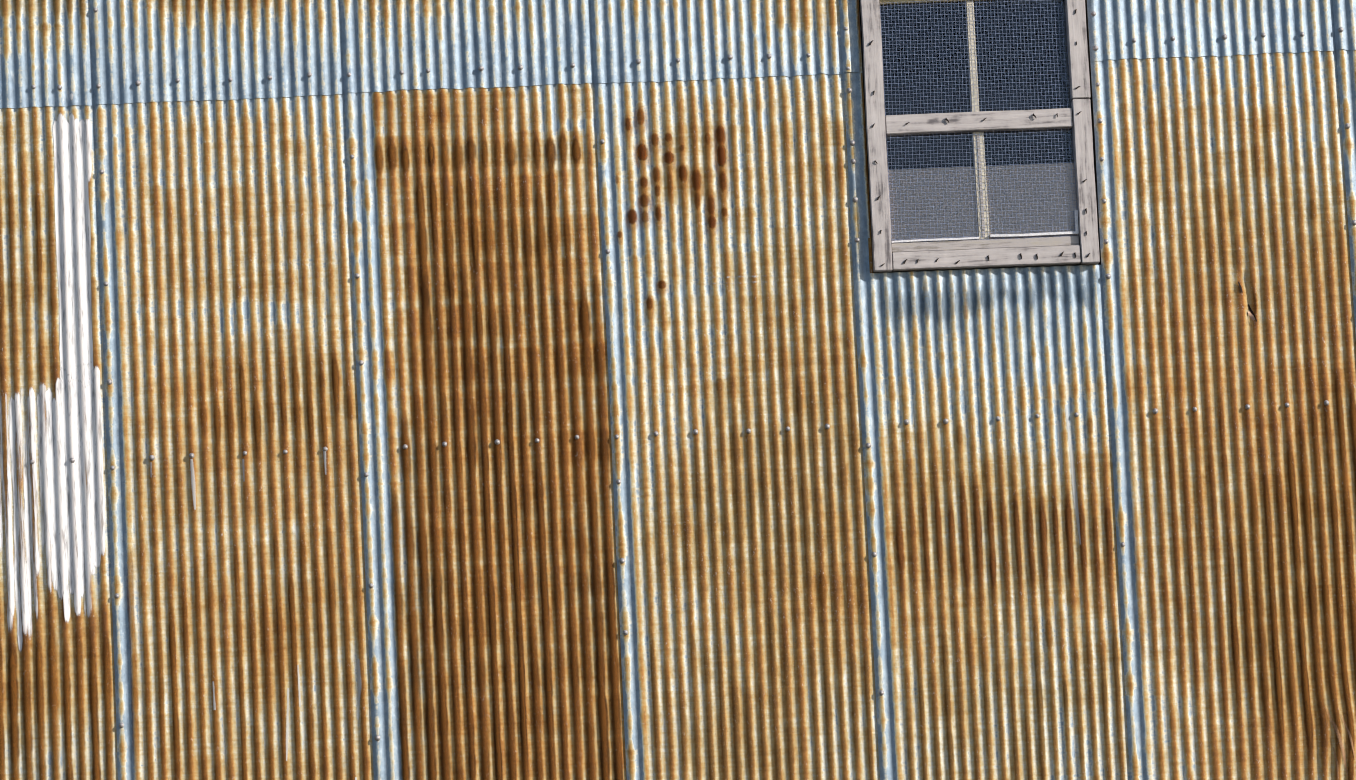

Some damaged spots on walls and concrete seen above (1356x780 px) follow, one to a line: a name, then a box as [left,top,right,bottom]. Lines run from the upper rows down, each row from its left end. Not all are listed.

corrosion [376,144,409,171]
corrosion [618,109,727,238]
corrosion [240,367,261,450]
corrosion [281,368,327,455]
corrosion [322,357,339,415]
corrosion [394,136,623,780]
corrosion [923,486,996,585]
corrosion [1014,498,1085,579]
corrosion [1229,385,1356,780]
corrosion [277,581,311,699]
corrosion [162,624,180,777]
corrosion [295,705,323,776]